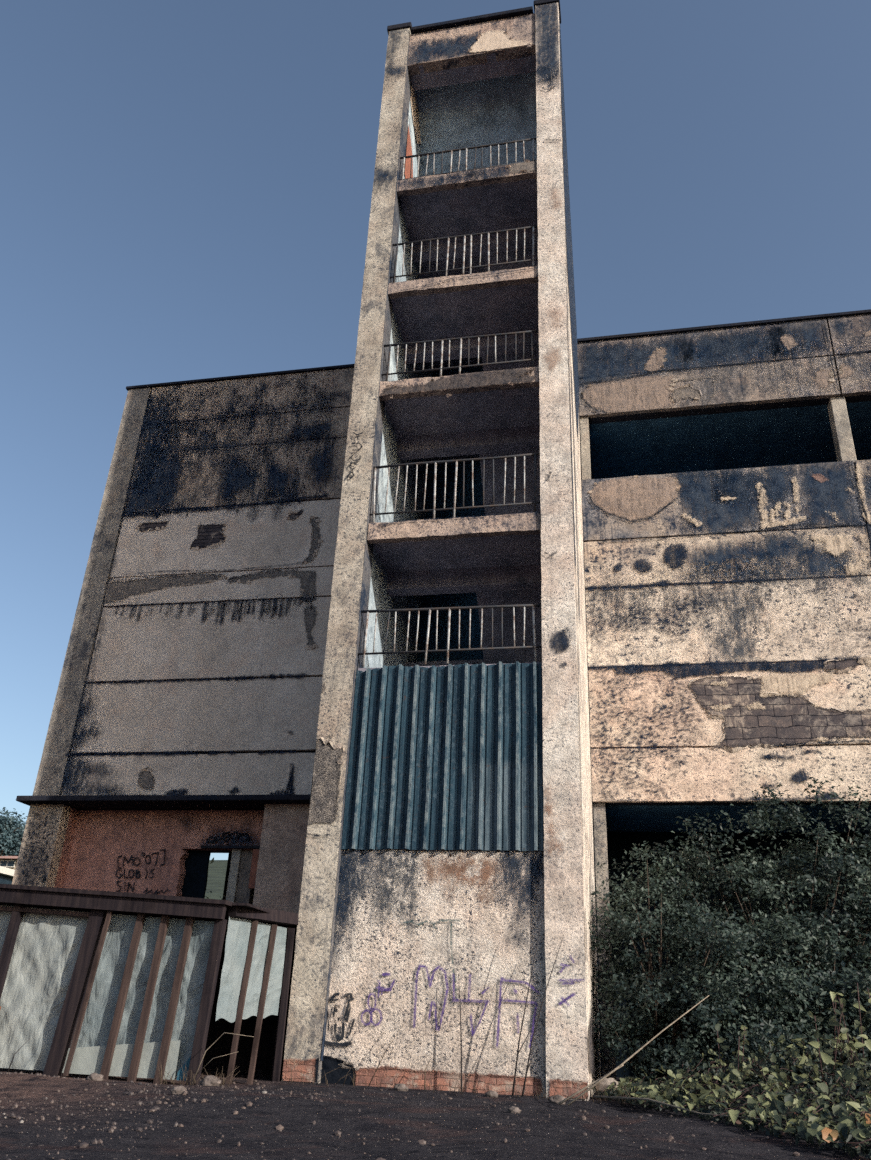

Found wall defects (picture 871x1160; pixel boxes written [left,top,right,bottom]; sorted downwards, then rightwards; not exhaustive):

leakage [536,3,871,801]
leakage [118,385,335,532]
peeling [755,477,806,528]
peeling [810,463,871,575]
peeling [104,508,323,650]
leakage [62,598,312,795]
spalling [688,655,871,753]
leakage [333,851,414,956]
leakage [503,853,543,944]